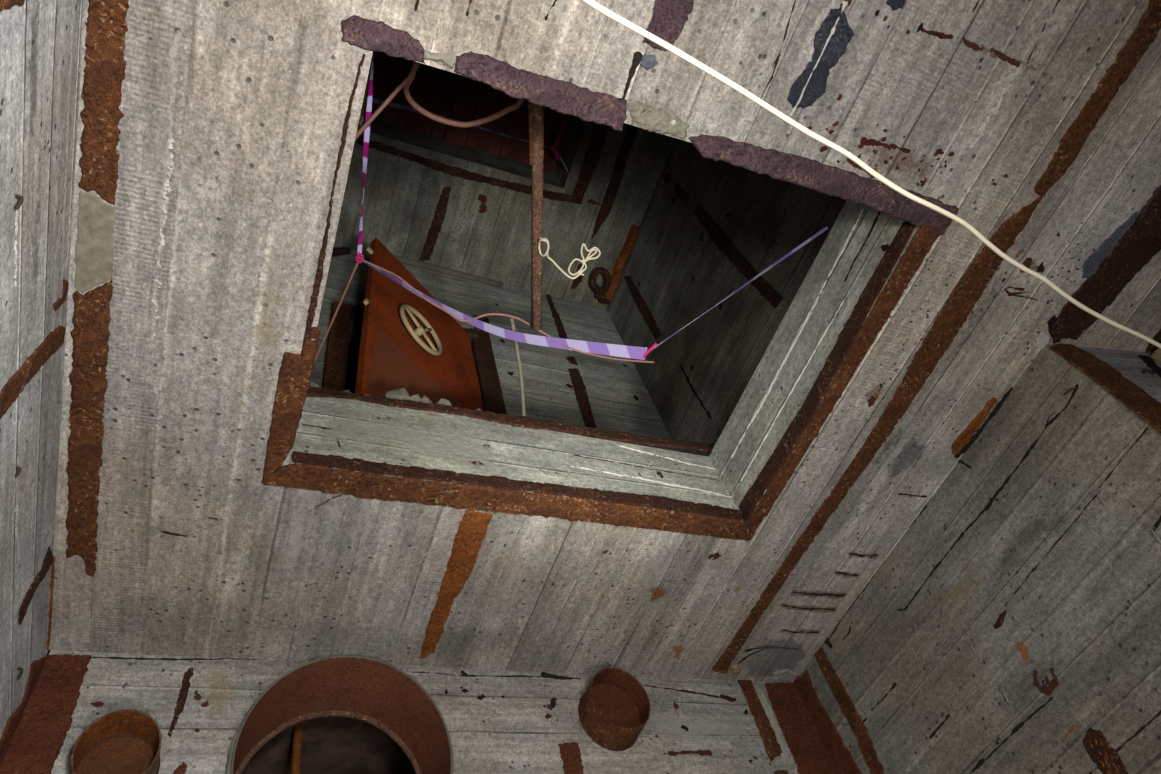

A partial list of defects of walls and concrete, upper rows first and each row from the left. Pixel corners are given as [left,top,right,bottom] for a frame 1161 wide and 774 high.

rust [1015,219,1095,286]
rust [782,592,845,610]
rust [993,610,1007,629]
rust [1062,725,1128,774]